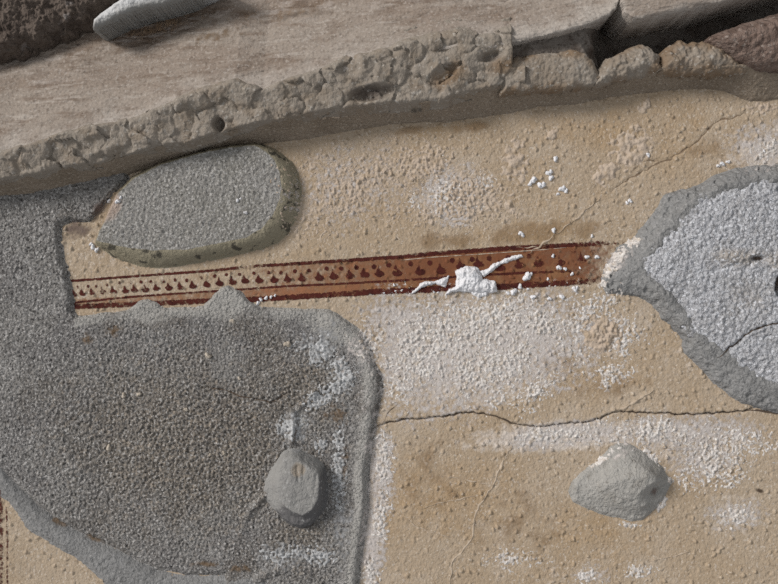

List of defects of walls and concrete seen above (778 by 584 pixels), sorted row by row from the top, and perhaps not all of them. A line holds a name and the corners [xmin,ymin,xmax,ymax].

crack [613,113,743,189]
water stain [269,125,533,249]
crack [522,201,597,252]
crack [717,323,778,358]
water stain [275,236,778,584]
crack [378,391,777,427]
water stain [252,540,338,568]